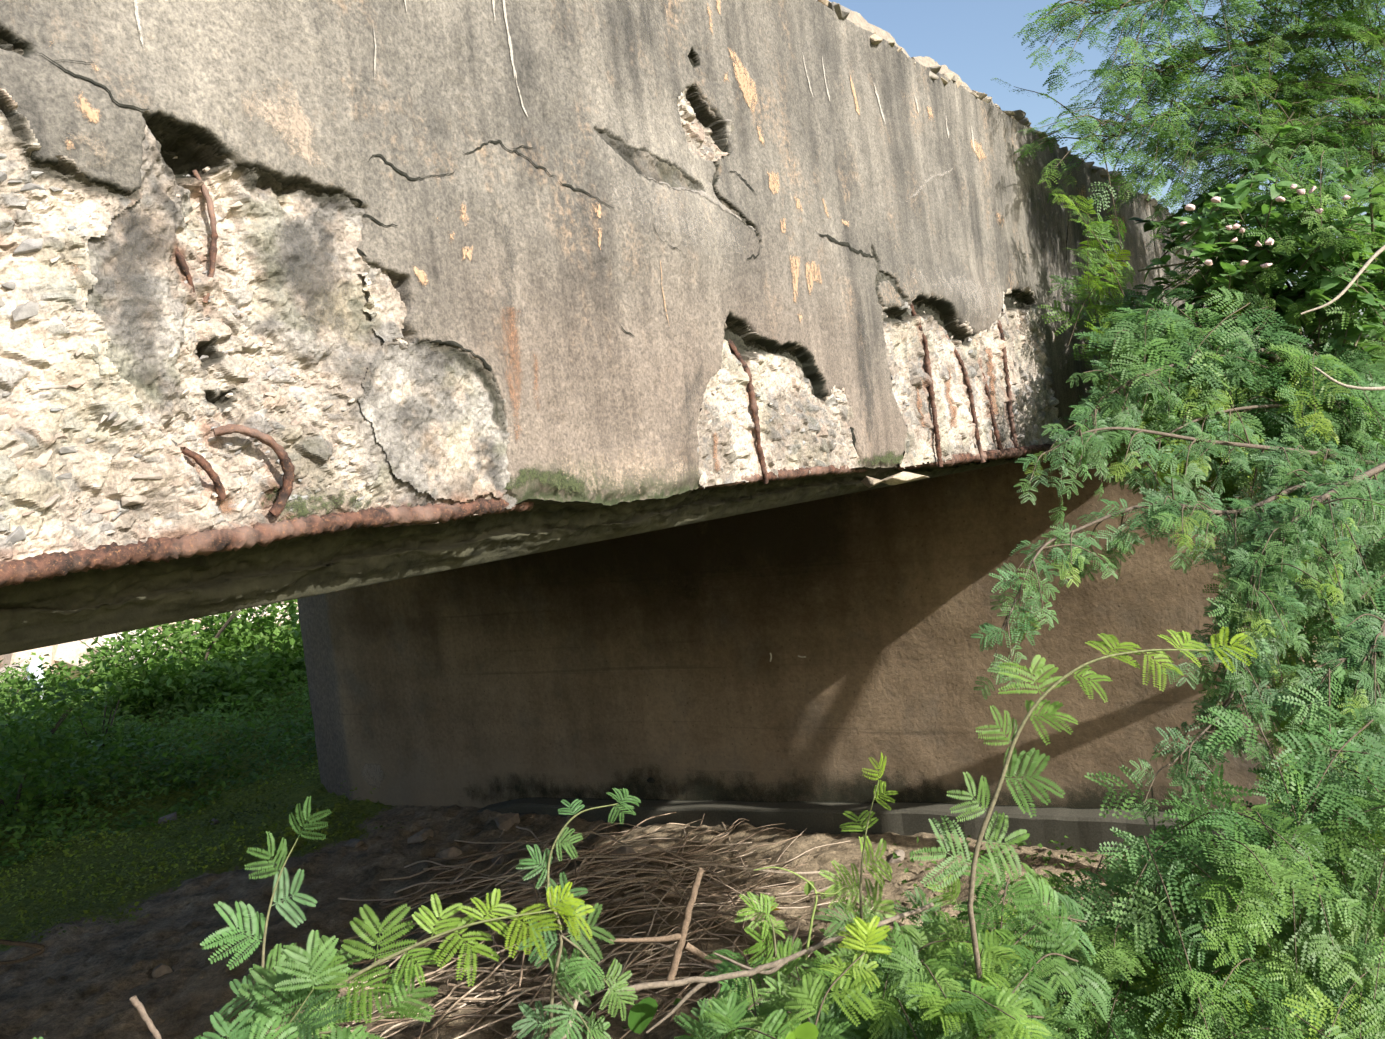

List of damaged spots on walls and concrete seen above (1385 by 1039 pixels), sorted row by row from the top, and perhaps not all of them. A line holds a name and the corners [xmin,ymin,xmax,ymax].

rust [175,170,218,304]
spalling [0,88,517,562]
crack [349,198,397,257]
crack [369,140,613,208]
leakage [492,0,528,117]
spalling [677,83,735,161]
rust [698,339,867,489]
crack [819,234,912,318]
spalling [675,286,1071,489]
rust [895,303,1081,470]
rust [0,424,534,588]
leakage [468,770,1208,812]